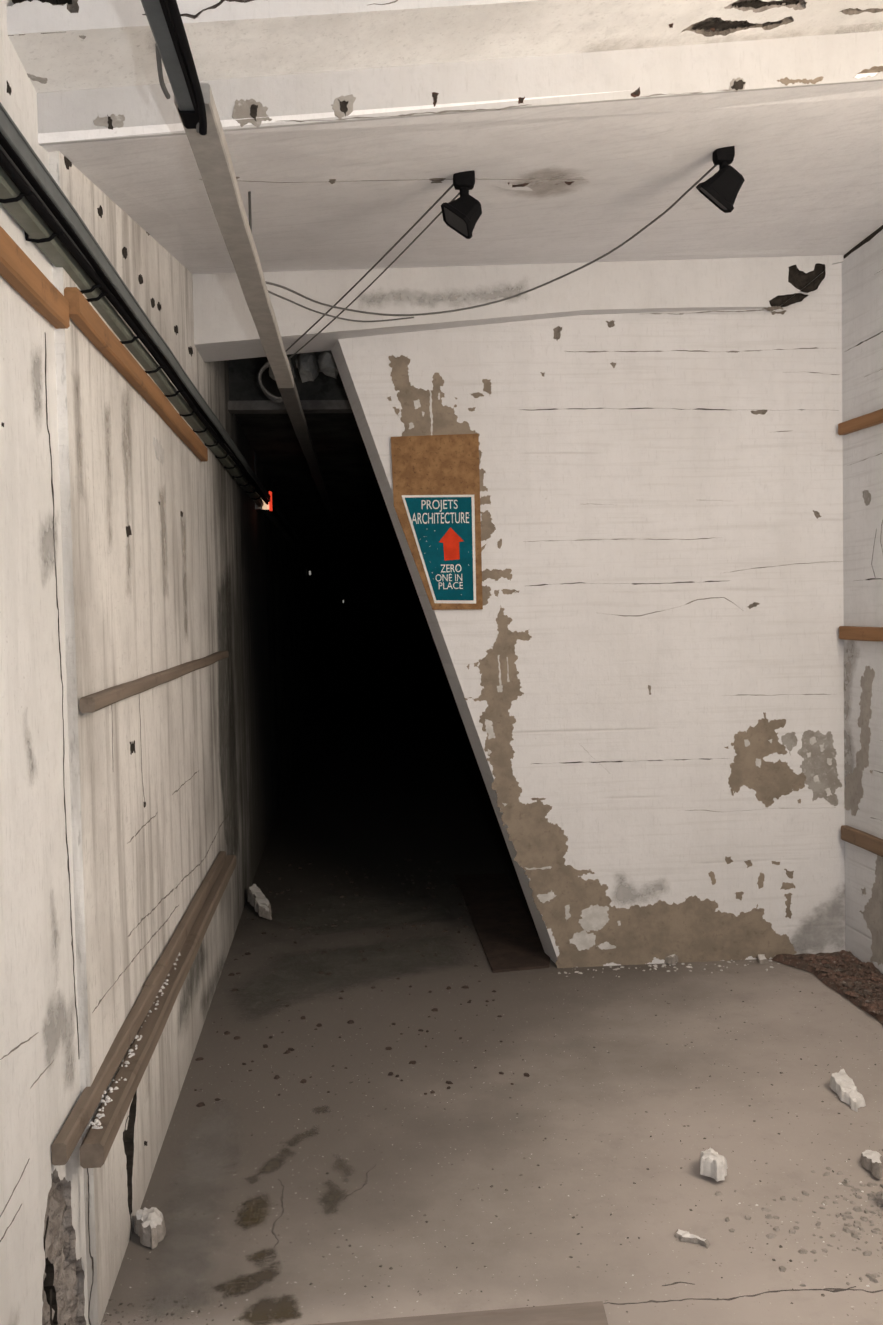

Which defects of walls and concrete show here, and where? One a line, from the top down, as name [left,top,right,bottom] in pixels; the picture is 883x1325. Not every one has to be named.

spalling [12,0,79,13]
crack [180,0,254,19]
spalling [669,0,807,37]
peeling [387,355,502,552]
peeling [464,568,797,977]
peeling [725,666,875,816]
crack [123,1090,137,1237]
water stain [237,1129,316,1228]
water stain [321,1160,350,1214]
spalling [42,1169,86,1325]
water stain [215,1250,301,1325]
crack [604,1282,883,1305]